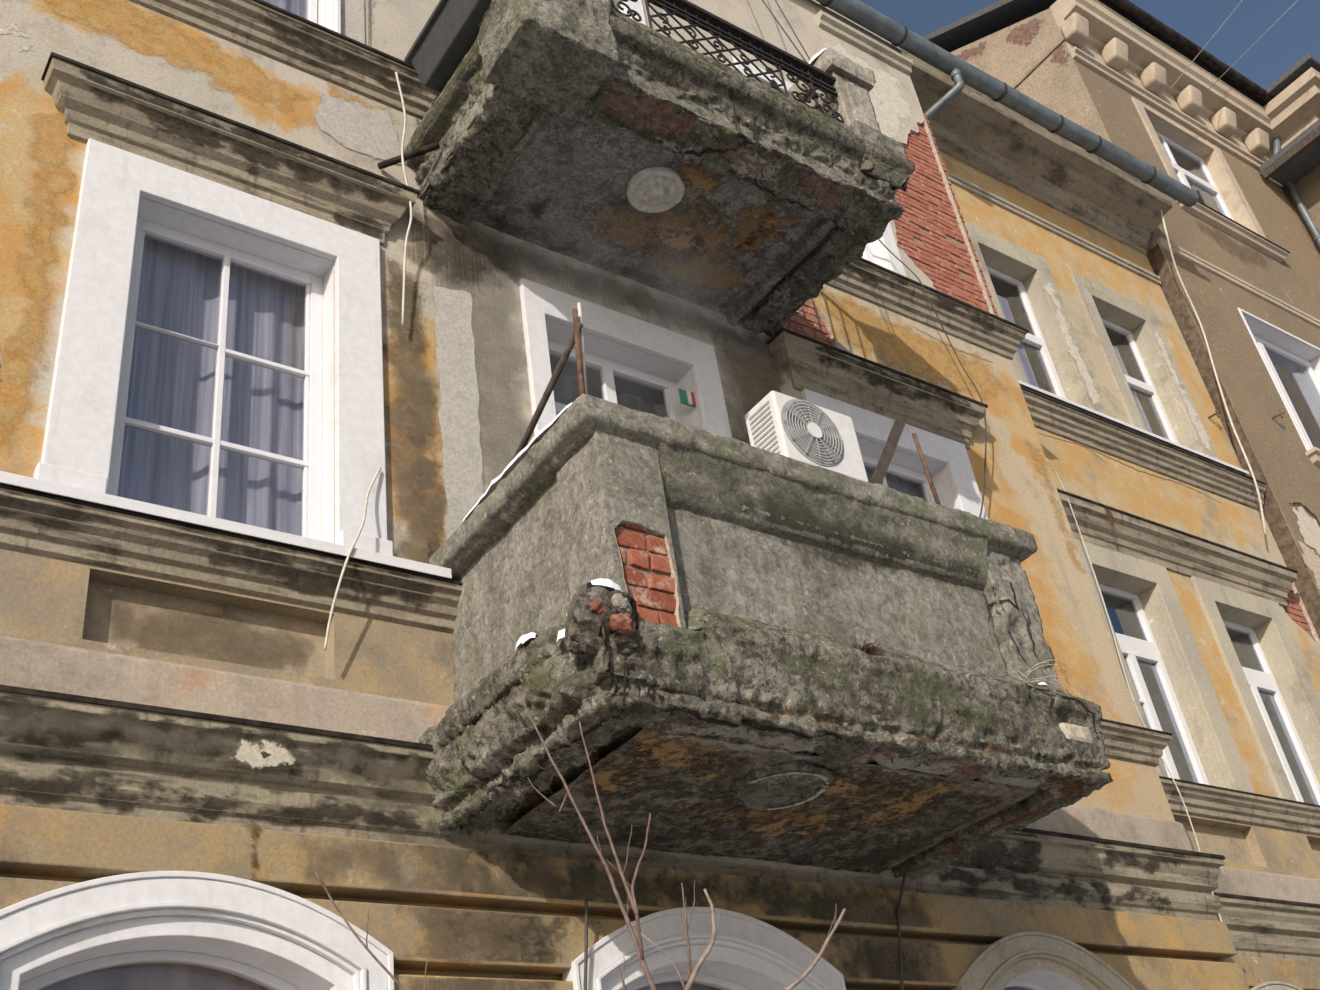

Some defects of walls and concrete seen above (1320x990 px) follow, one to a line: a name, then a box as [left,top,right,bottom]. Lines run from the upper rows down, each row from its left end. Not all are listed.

crack [365,0,373,45]
flaking render [814,33,999,317]
peeling [785,288,1003,399]
water stain [181,209,781,609]
water stain [0,492,102,532]
flaking render [564,520,681,658]
spalling [1292,506,1320,590]
water stain [0,694,431,881]
spalling [231,739,296,768]
crack [455,653,843,829]
water stain [938,832,1195,911]
water stain [415,977,550,990]